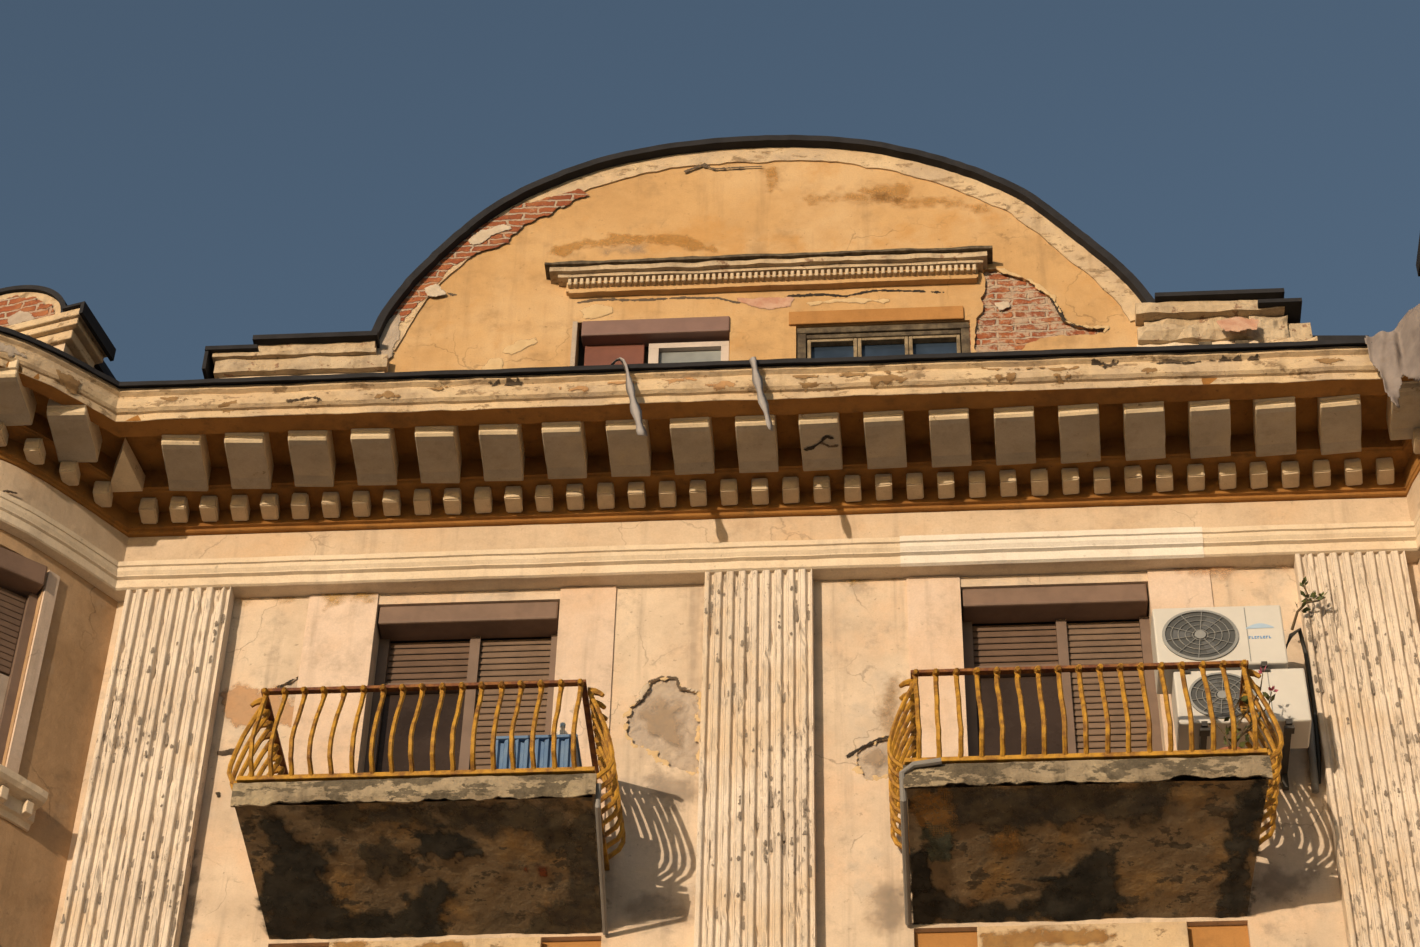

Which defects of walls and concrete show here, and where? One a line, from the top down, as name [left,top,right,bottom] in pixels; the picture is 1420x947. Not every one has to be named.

flaking render [377,188,588,358]
damp [552,234,716,256]
crack [787,289,944,306]
flaking render [969,268,1110,352]
spalling [1141,354,1260,374]
peeling [220,677,298,727]
flaking render [623,675,710,776]
peeling [1346,612,1420,724]
damp [256,800,608,947]
damp [911,848,1134,947]
damp [941,780,1173,836]
damp [1216,779,1267,918]